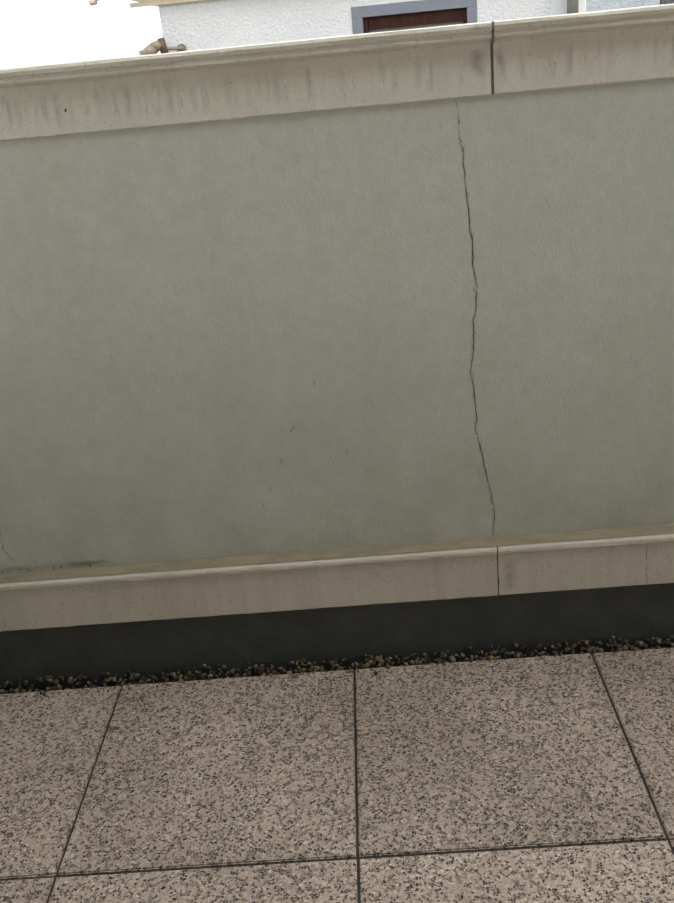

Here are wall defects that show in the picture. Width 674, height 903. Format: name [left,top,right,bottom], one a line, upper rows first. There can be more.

crack [461,147,495,532]